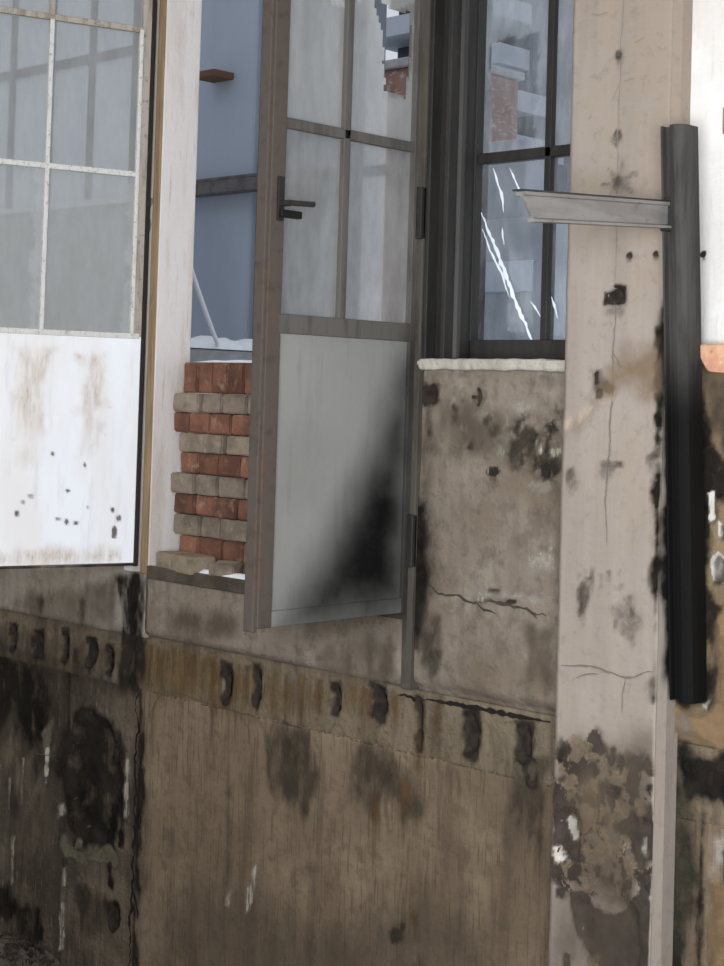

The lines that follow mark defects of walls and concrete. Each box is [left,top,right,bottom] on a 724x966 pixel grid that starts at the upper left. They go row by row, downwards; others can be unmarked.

damp [0,642,103,810]
damp [116,573,145,694]
damp [274,731,318,814]
damp [414,504,440,662]
crack [429,585,546,618]
spalling [515,720,537,788]
crack [561,665,651,702]
flaking render [675,608,724,749]
flaking render [708,491,724,538]
flaking render [710,551,724,585]
damp [0,837,44,945]
flaking render [551,729,654,966]